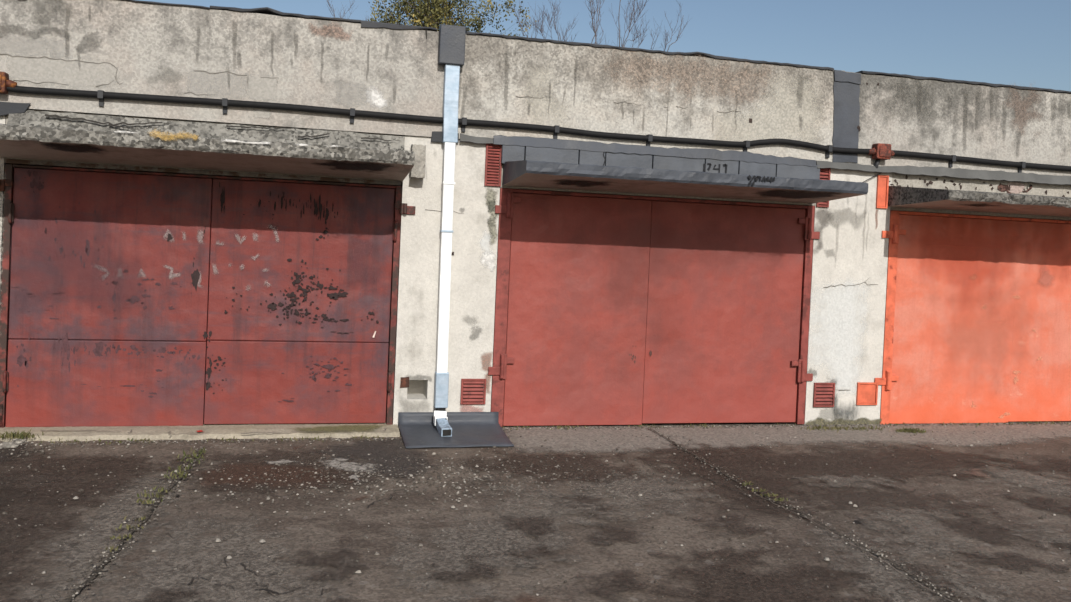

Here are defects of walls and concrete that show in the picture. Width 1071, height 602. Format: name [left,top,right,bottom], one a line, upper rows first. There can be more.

leakage [311,25,349,38]
peeling [975,181,1032,194]
peeling [257,191,338,240]
peeling [224,259,379,334]